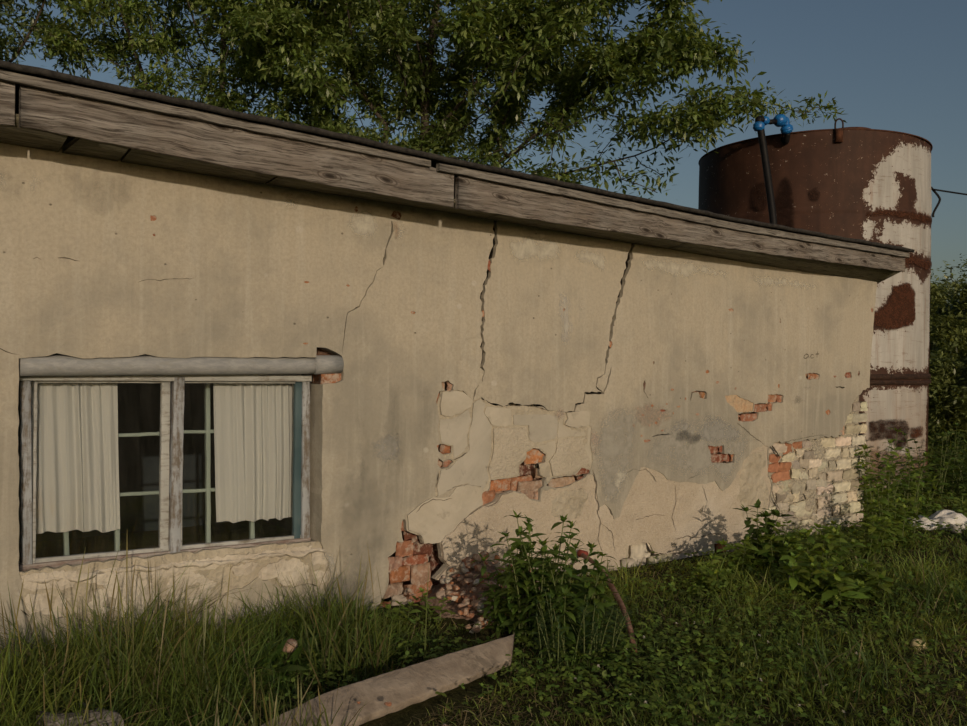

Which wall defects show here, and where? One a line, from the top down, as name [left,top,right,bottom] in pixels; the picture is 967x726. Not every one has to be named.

flaking render [437,444,452,468]
flaking render [379,521,444,608]